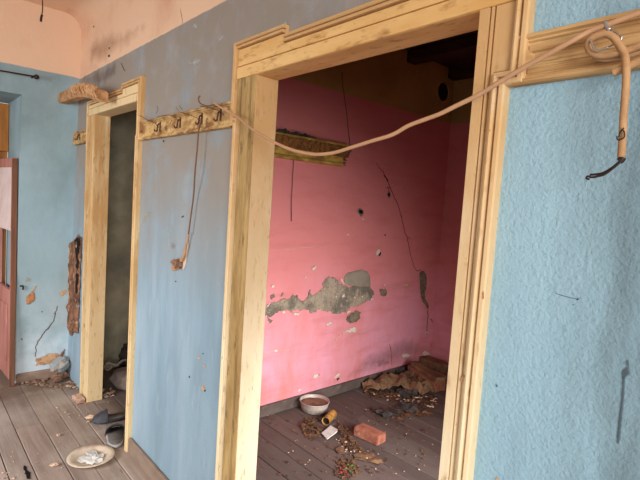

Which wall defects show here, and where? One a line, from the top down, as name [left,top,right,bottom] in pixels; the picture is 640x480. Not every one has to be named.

flaking render [60,234,82,336]
flaking render [265,269,387,323]
crack [35,306,58,357]
peeling [35,349,65,366]